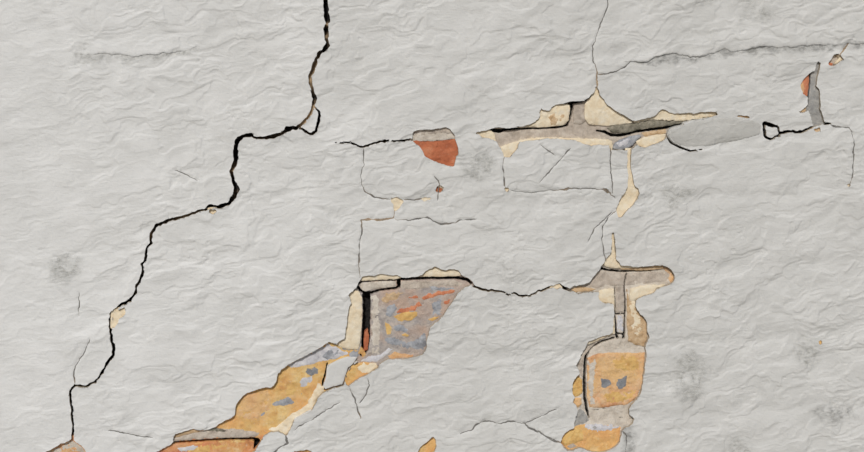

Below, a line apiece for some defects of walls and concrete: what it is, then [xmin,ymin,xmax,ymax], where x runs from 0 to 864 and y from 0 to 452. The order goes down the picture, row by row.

crack [592,0,631,87]
spalling [799,54,842,127]
spalling [408,127,458,166]
spalling [476,87,717,217]
crack [762,121,855,183]
crack [69,0,330,433]
crack [335,138,475,274]
crack [461,277,566,296]
spalling [157,267,474,452]
spalling [561,233,673,451]
spalling [46,433,86,452]
crack [274,380,370,452]